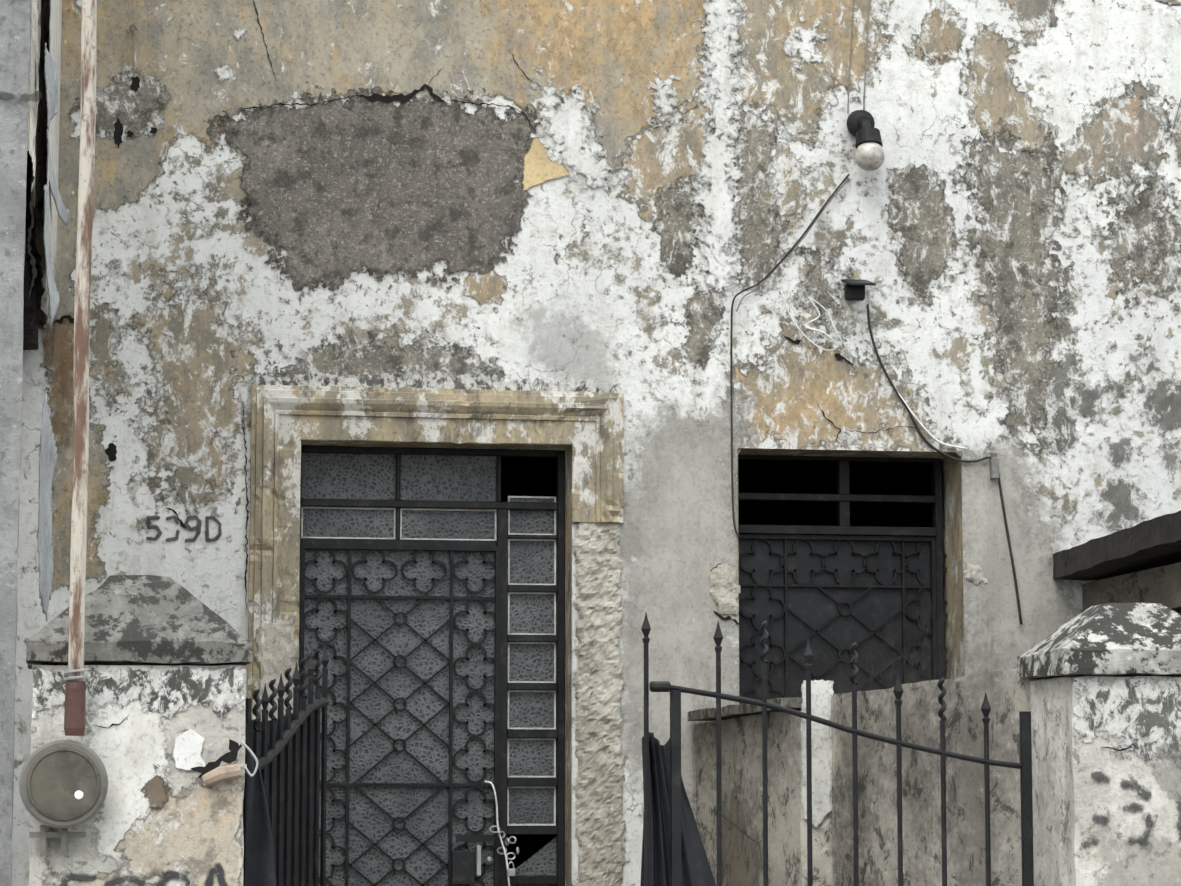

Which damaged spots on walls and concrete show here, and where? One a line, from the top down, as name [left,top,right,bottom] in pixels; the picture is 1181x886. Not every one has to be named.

crack [239,0,547,132]
flaking render [23,0,82,622]
peeling [86,262,505,583]
flaking render [93,0,1181,462]
mould [1041,345,1181,532]
peeling [41,699,247,886]
flaking render [573,522,626,886]